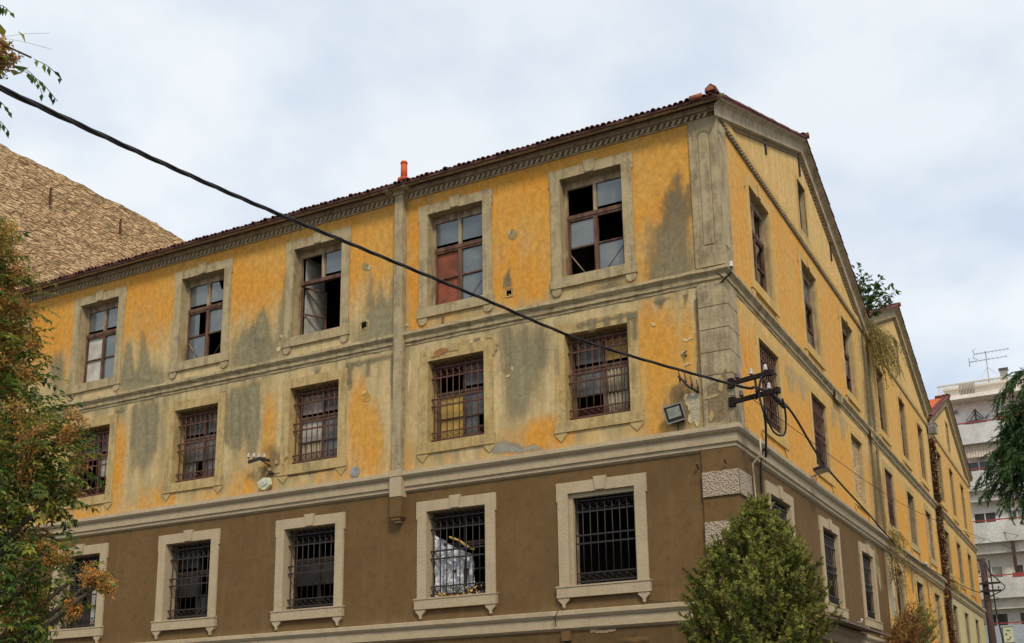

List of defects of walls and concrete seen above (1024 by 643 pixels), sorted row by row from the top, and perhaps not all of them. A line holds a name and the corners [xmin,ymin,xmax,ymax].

leakage [649,173,692,280]
leakage [233,276,286,365]
leakage [122,334,164,391]
leakage [118,403,158,467]
leakage [224,384,259,454]
flaking render [683,369,729,427]